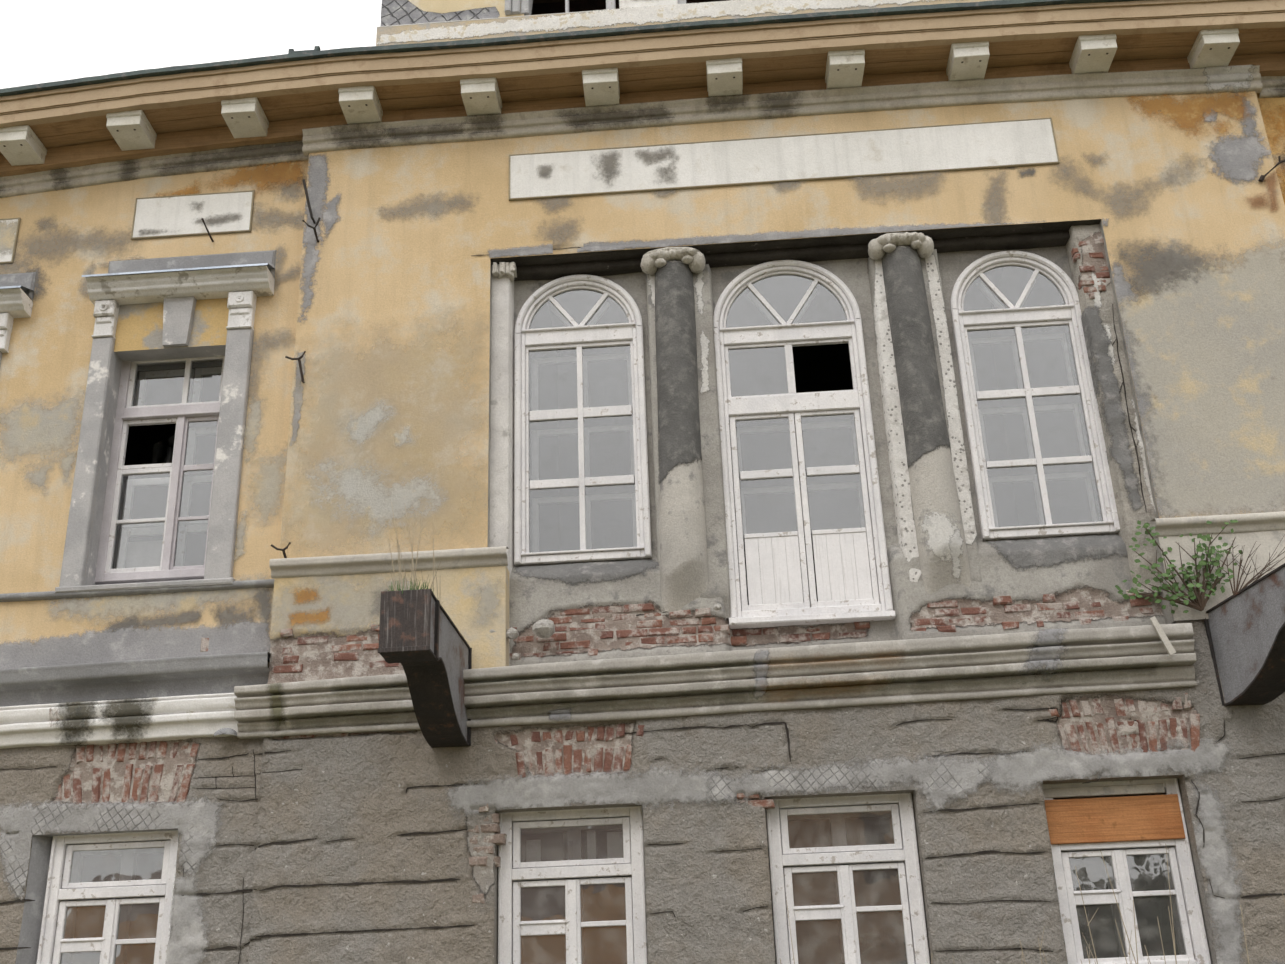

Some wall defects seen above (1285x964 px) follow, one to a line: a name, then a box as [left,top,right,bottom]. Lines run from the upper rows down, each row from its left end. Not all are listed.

spalling [577,222,1036,252]
water stain [1119,239,1218,296]
flaking render [1071,219,1285,518]
peeling [866,254,977,582]
flaking render [509,600,870,660]
water stain [59,698,153,746]
flaking render [1048,693,1200,756]
crack [196,749,302,802]
crack [397,828,467,836]
crack [1191,780,1205,847]
crack [182,838,474,964]
crack [1209,879,1285,898]